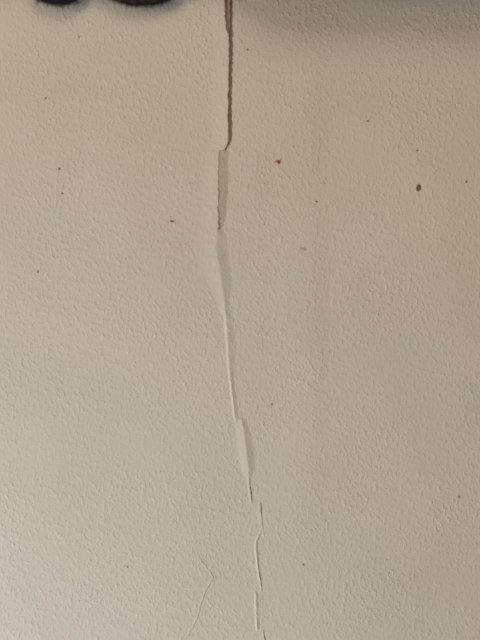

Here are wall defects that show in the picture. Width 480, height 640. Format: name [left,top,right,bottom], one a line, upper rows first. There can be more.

peeling [218,150,229,229]
crack [196,0,266,640]